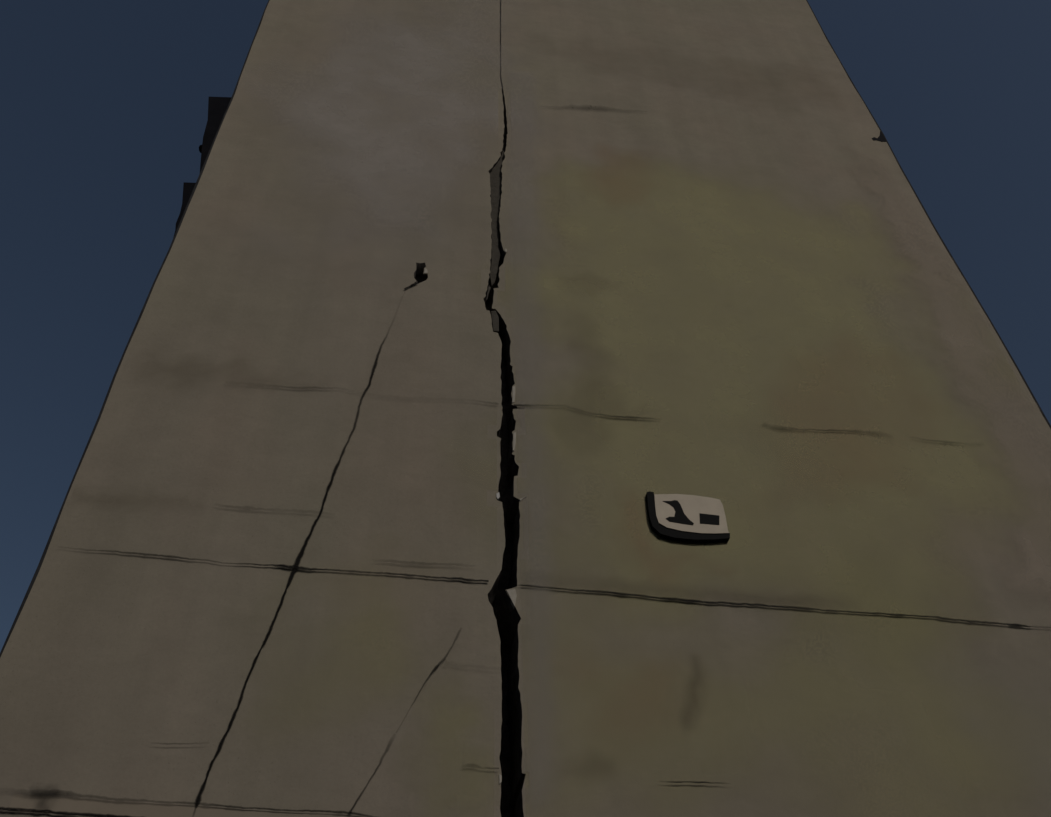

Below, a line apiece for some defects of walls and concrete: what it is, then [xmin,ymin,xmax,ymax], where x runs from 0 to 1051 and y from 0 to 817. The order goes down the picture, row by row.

crack [0,807,132,817]
crack [98,550,202,560]
crack [158,343,489,817]
crack [484,0,1025,817]